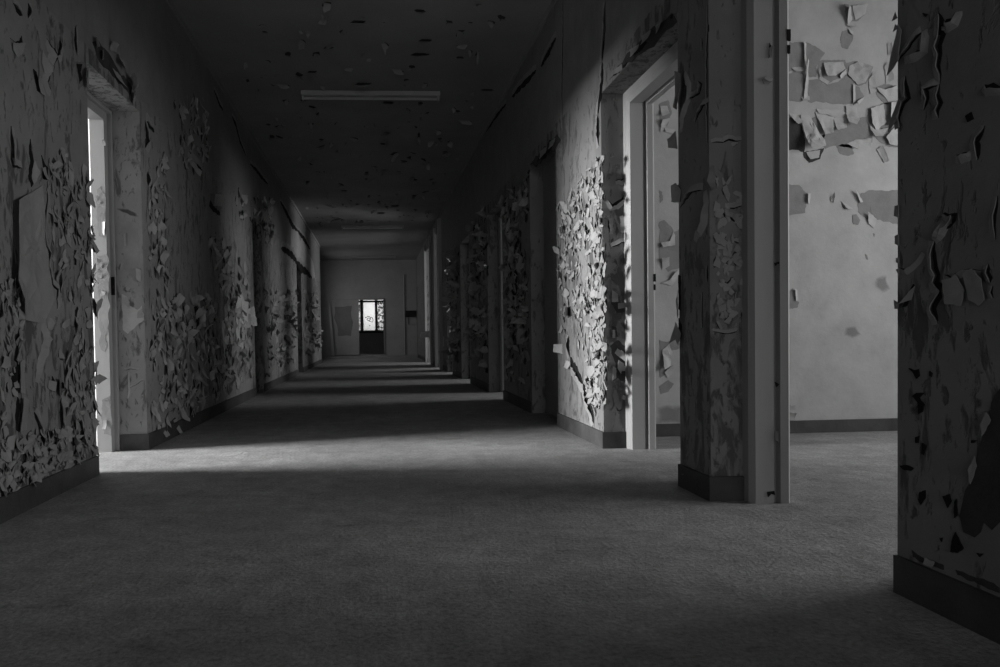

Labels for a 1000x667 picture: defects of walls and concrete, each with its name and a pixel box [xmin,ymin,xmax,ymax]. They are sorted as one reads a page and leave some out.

peeling [75,36,139,104]
crack [595,0,606,149]
peeling [659,71,681,149]
peeling [789,4,902,163]
peeling [0,92,323,497]
peeling [553,154,626,416]
peeling [659,183,681,203]
peeling [659,220,682,394]
peeling [713,175,744,327]
peeling [789,184,811,215]
peeling [831,190,899,246]
peeling [939,389,1000,553]